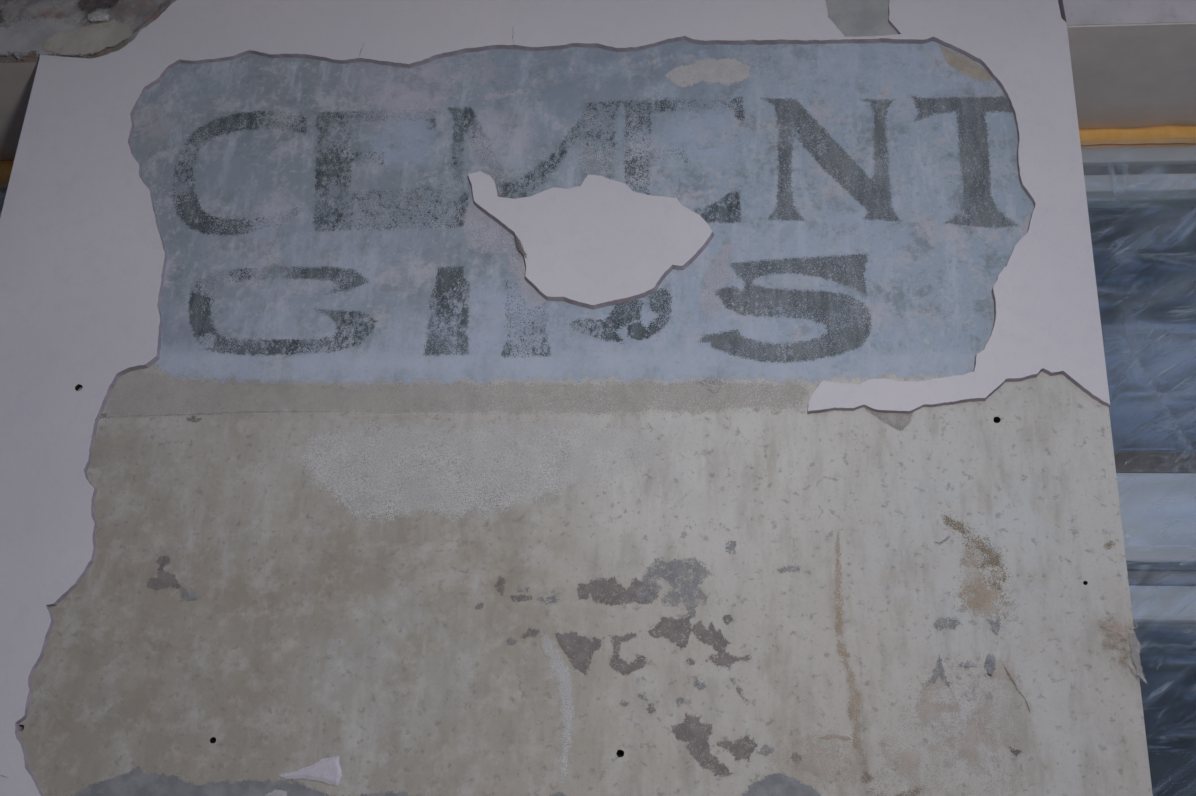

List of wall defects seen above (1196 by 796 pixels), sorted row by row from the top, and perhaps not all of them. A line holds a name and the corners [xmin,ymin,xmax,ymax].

flaking render [0,0,176,63]
peeling [128,36,1036,232]
peeling [15,176,1153,796]